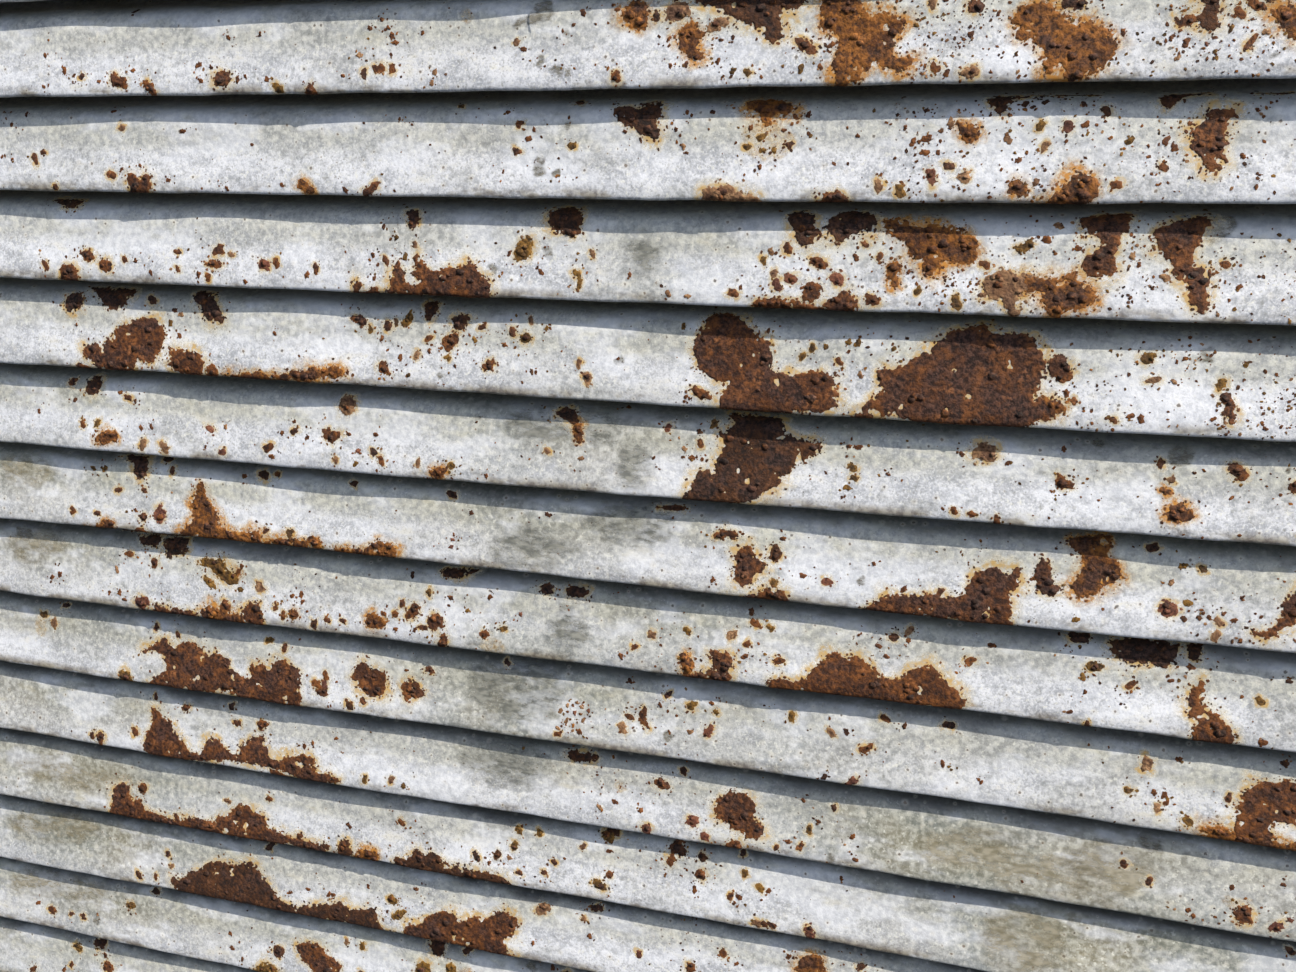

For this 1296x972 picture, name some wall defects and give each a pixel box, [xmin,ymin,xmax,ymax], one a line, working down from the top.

corrosion [494,37,577,83]
corrosion [280,177,319,195]
corrosion [455,63,818,202]
corrosion [556,0,1296,528]
corrosion [32,217,522,785]
corrosion [520,404,596,472]
corrosion [99,454,1296,972]